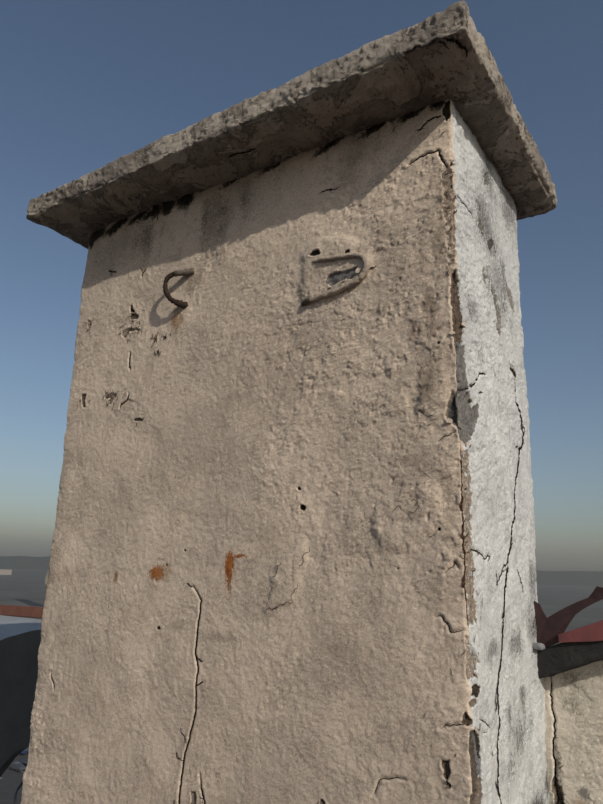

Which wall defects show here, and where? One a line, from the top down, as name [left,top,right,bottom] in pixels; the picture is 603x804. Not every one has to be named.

crack [409,150,447,168]
damp [88,193,194,248]
spalling [325,266,376,289]
spalling [442,160,483,626]
rust [149,564,164,580]
rust [225,551,245,589]
crack [438,364,525,804]
crack [173,583,205,804]
spalling [461,636,483,804]
crack [550,681,559,804]
spalling [442,754,456,789]